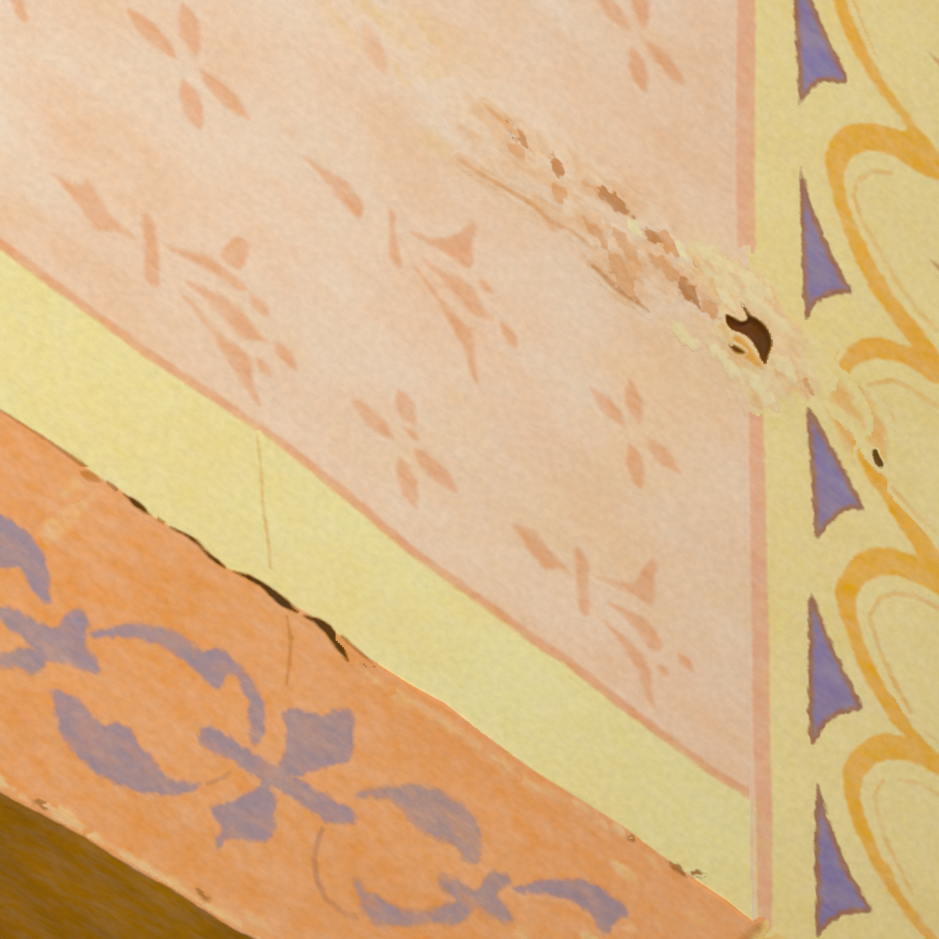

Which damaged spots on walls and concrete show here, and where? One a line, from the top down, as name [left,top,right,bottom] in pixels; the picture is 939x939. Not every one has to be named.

peeling [431,77,838,422]
crack [0,404,378,691]
spalling [870,447,885,471]